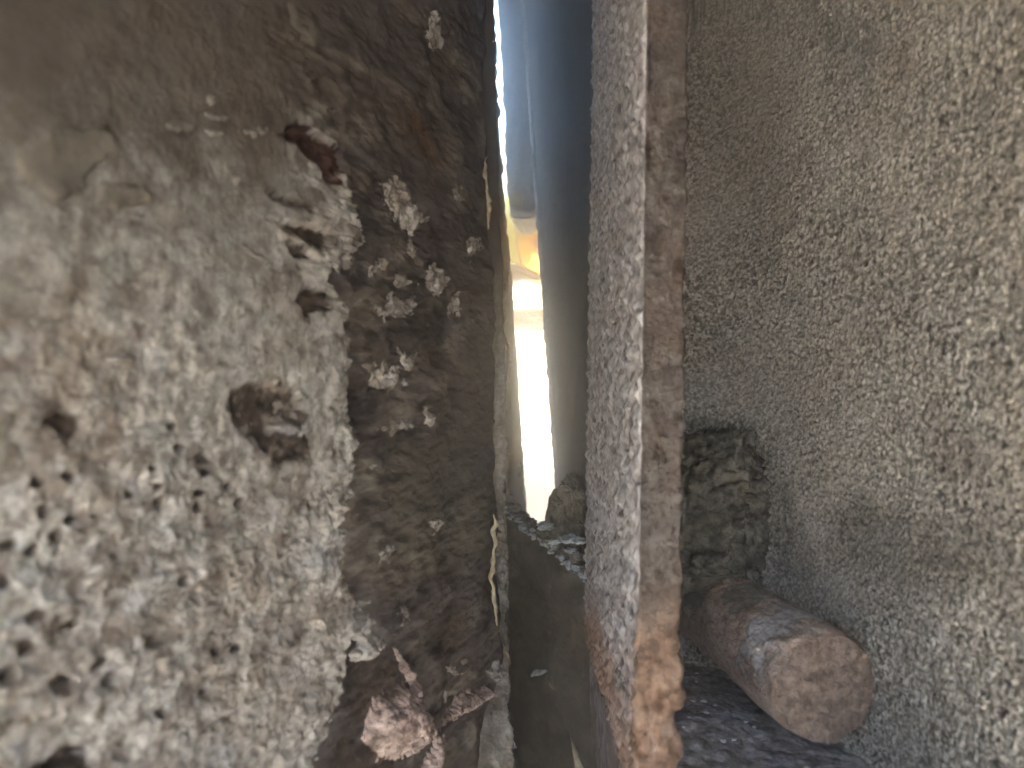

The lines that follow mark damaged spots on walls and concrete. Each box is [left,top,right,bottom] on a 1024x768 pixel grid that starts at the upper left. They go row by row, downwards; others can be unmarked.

rust [280,125,342,185]
spalling [225,382,309,469]
spalling [284,0,504,768]
crack [488,257,513,626]